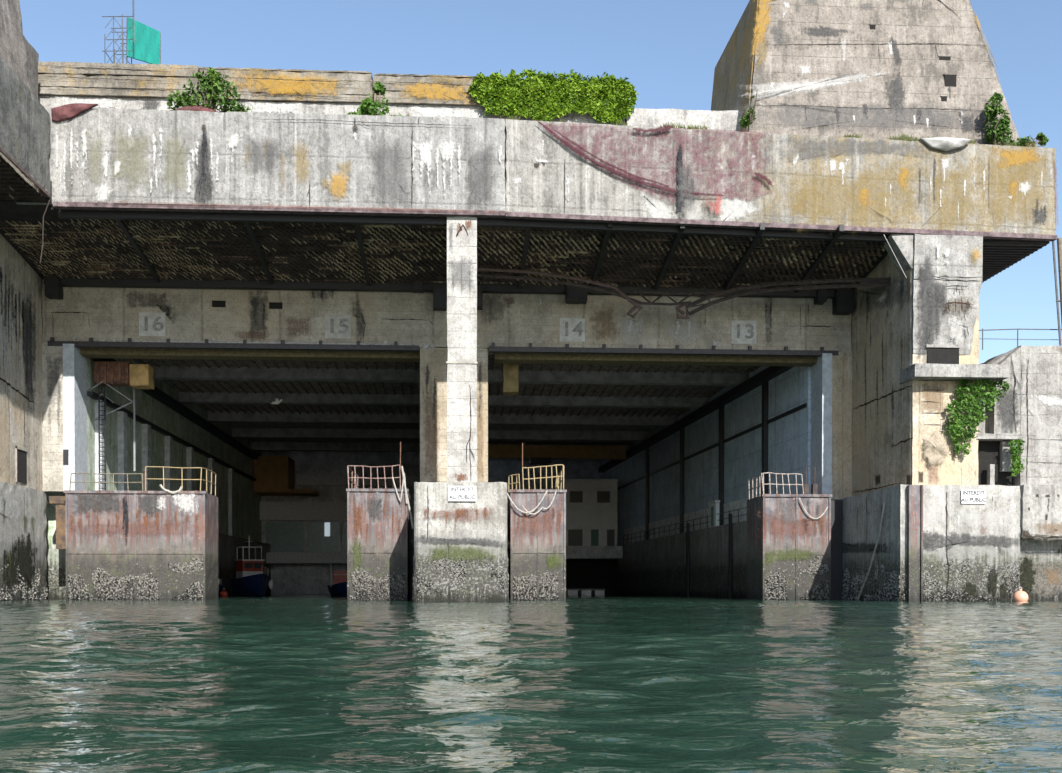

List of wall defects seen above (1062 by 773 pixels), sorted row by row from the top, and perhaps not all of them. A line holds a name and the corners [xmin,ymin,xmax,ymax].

leakage [187,124,242,209]
crack [0,378,35,433]
rust [354,498,401,544]